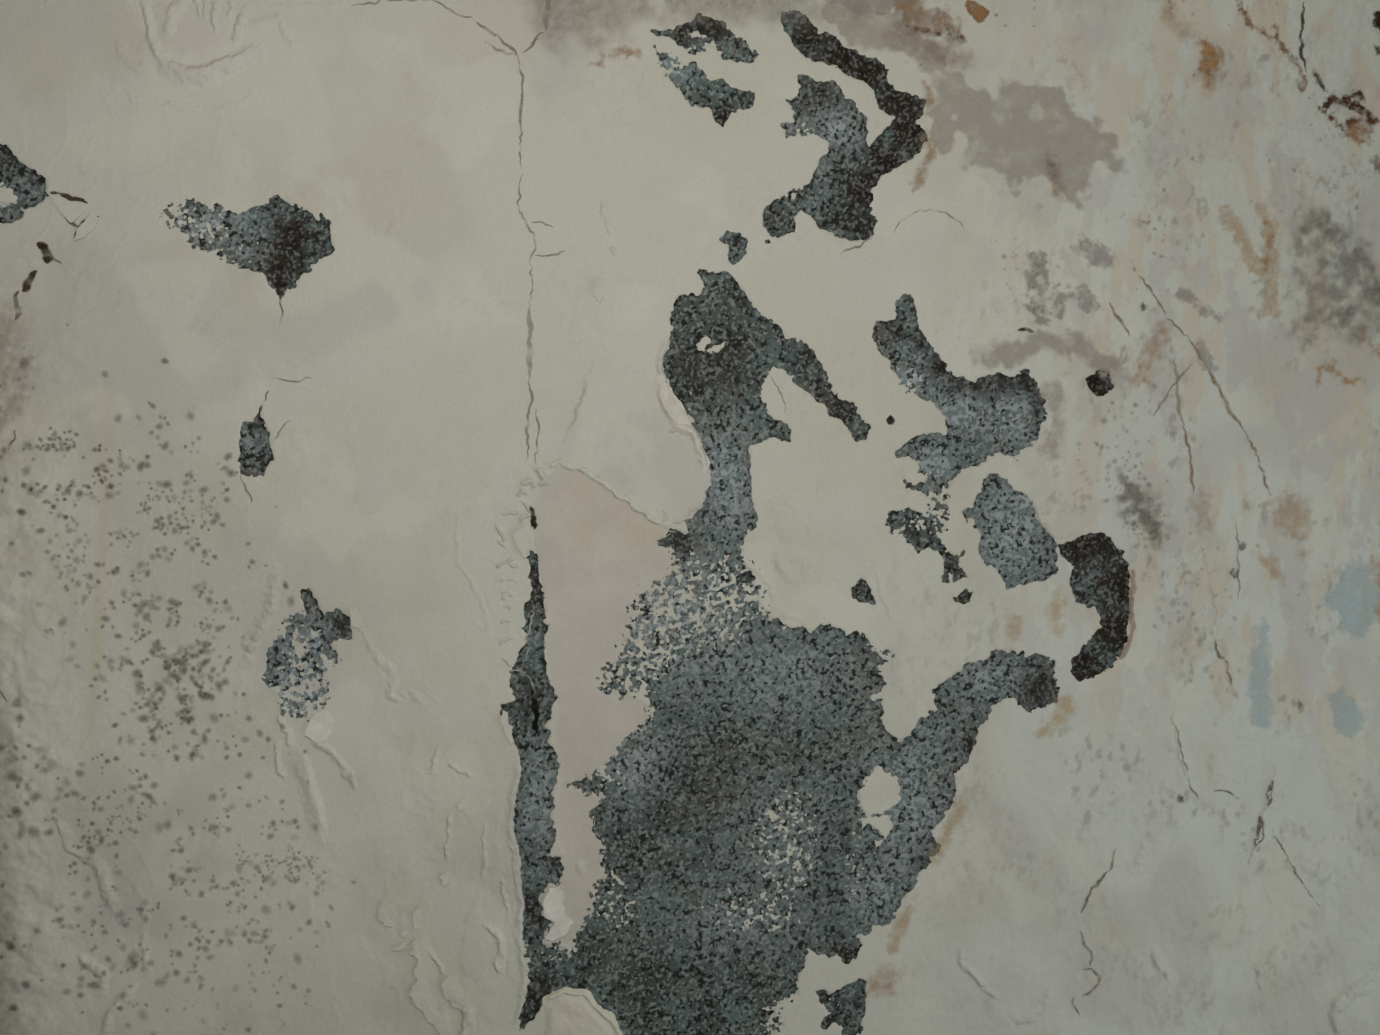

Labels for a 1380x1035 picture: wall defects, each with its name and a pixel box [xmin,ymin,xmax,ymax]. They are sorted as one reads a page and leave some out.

crack [352,0,564,306]
spalling [650,13,759,127]
spalling [763,10,928,244]
rust [894,0,963,40]
damp [823,0,1121,207]
rust [965,0,989,23]
spalling [161,195,335,299]
spalling [237,405,275,477]
crack [526,380,540,465]
crack [1140,277,1271,496]
spalling [481,230,1138,1035]
crack [1215,639,1232,685]